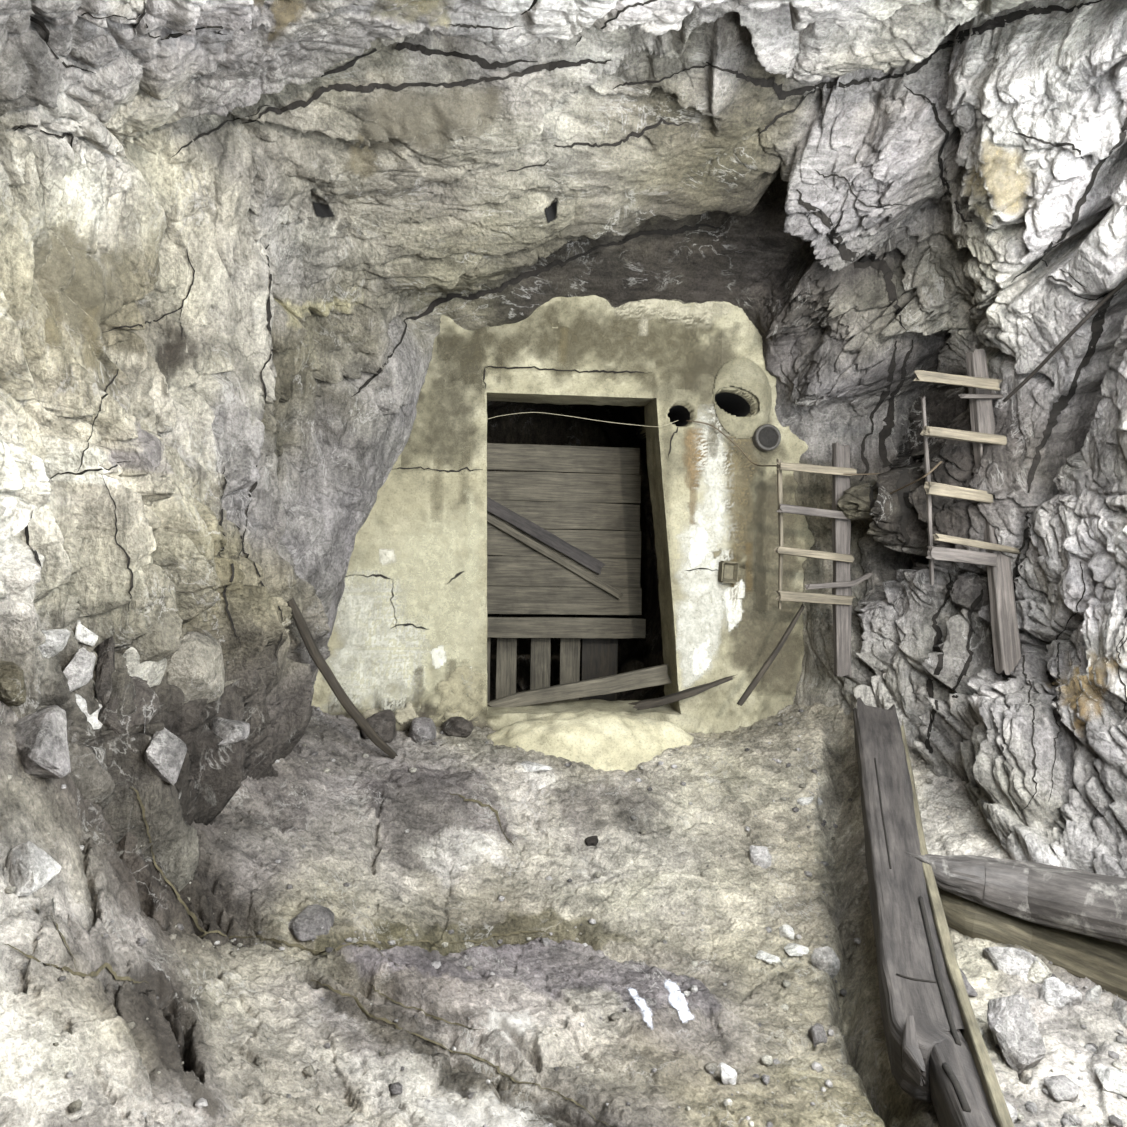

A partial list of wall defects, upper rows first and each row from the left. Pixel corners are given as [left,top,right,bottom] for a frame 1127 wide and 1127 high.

damp [356,482,478,731]
damp [404,299,800,690]
peeling [676,409,756,687]